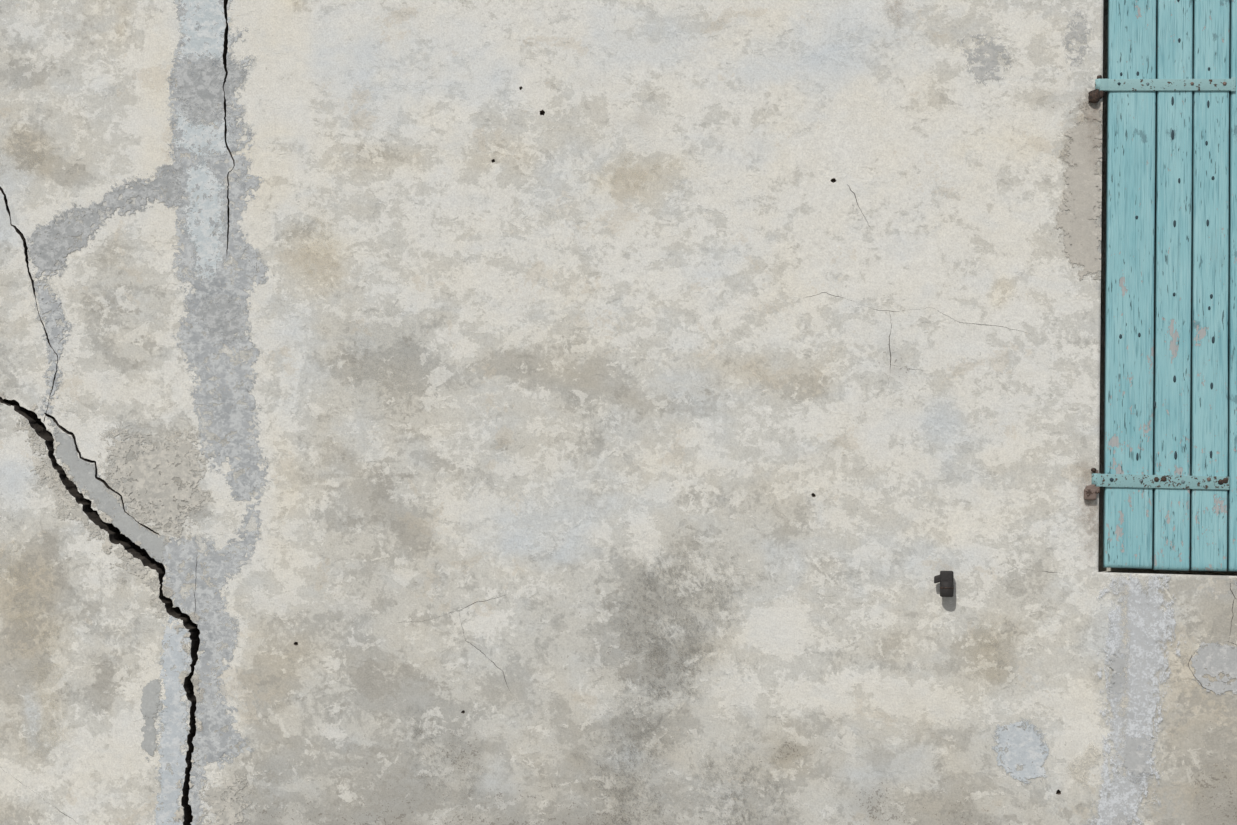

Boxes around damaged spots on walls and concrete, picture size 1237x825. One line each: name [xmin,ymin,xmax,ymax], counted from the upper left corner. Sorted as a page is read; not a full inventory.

crack [223,0,235,259]
crack [0,187,203,825]
peeling [992,718,1049,785]